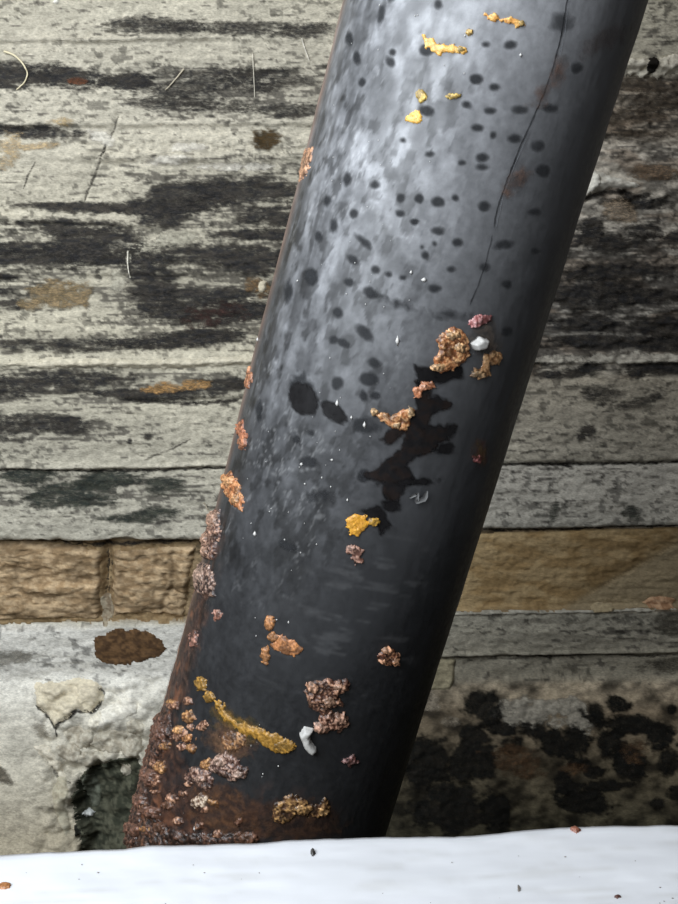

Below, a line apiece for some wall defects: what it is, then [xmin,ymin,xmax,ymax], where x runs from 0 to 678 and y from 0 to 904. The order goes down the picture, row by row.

crack [471,0,569,302]
damp [0,142,296,353]
damp [0,412,93,441]
damp [0,368,244,404]
rust [371,314,503,431]
damp [414,364,463,387]
rust [346,514,380,566]
rust [260,615,303,665]
spalling [34,698,145,851]
rust [123,676,340,847]
rust [303,678,351,735]
damp [405,689,678,837]